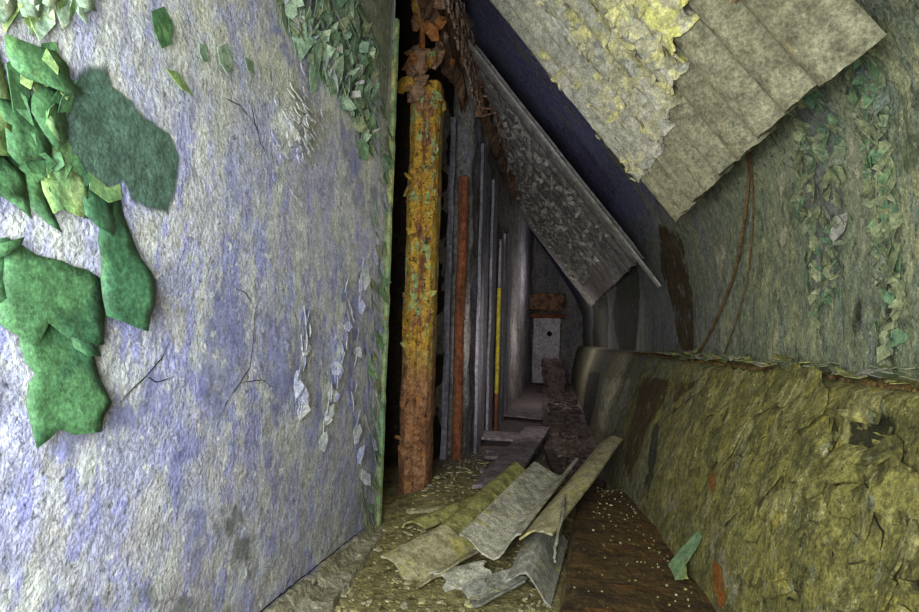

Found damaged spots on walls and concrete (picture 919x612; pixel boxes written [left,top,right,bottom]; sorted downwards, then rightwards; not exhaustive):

peeling [0,0,156,448]
peeling [151,7,174,48]
rust [416,0,523,203]
peeling [532,0,696,143]
peeling [619,151,646,182]
water stain [659,225,694,351]
peeling [654,47,919,612]
crack [849,515,885,551]